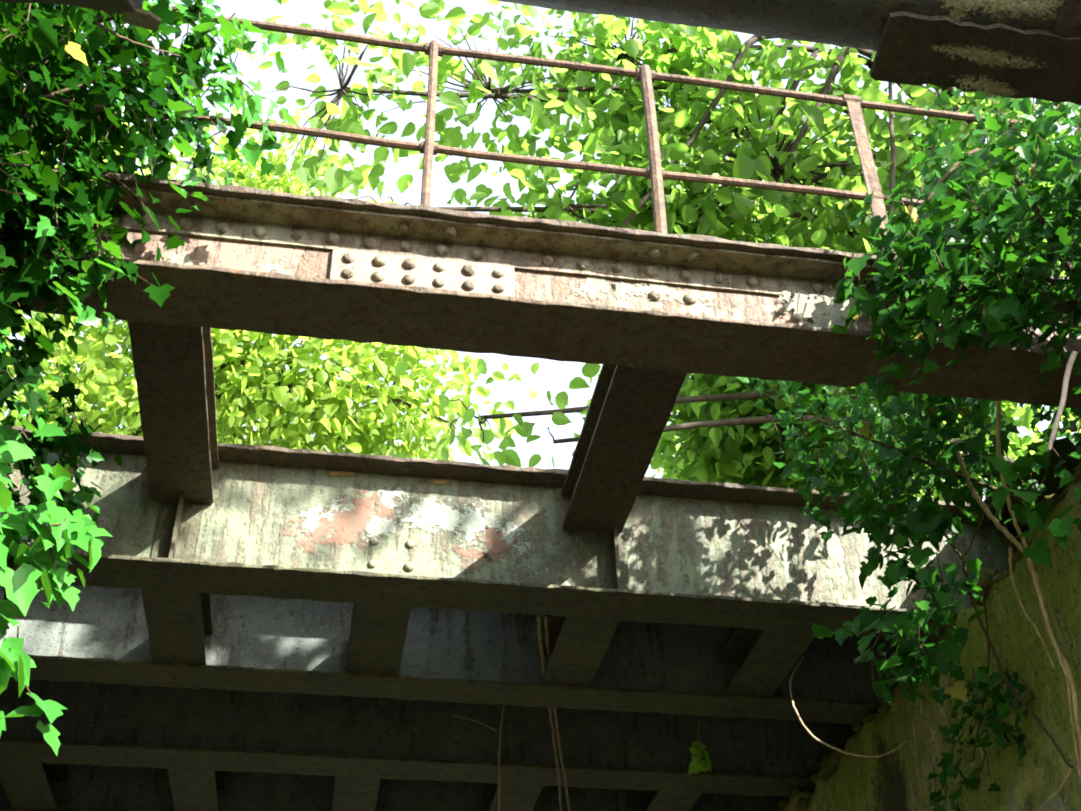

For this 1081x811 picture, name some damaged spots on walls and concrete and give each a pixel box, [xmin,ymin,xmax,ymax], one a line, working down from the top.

peeling [279,485,532,574]
leakage [870,732,916,811]